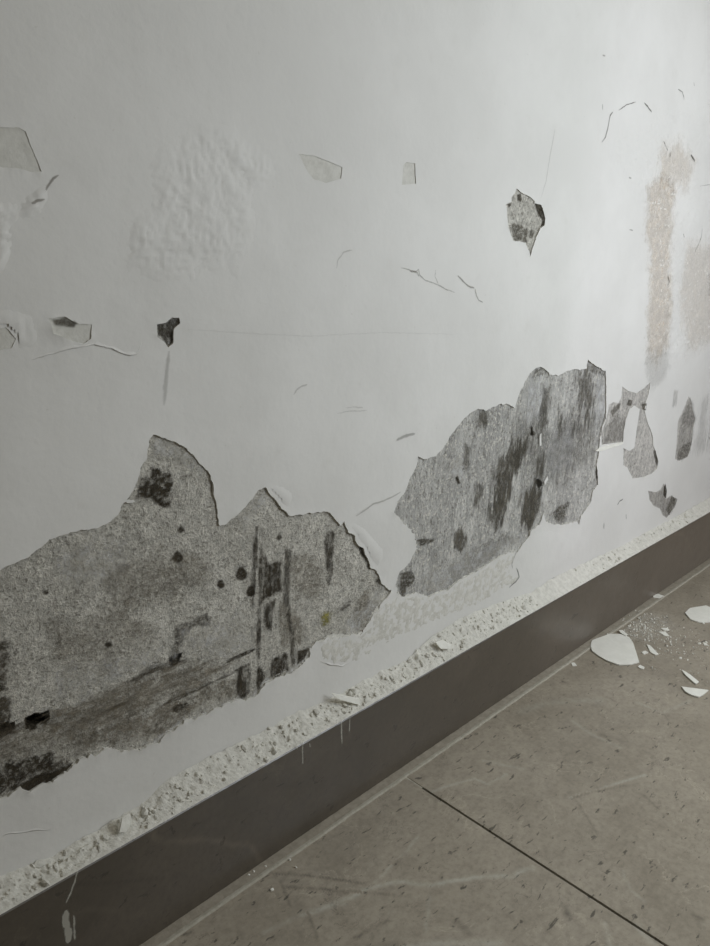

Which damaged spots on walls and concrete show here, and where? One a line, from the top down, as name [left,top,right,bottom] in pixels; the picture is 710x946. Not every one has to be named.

peeling [0,127,41,172]
peeling [506,189,545,253]
peeling [157,318,179,346]
flaking render [675,397,695,460]
flaking render [648,484,677,518]
flaking render [0,362,658,797]